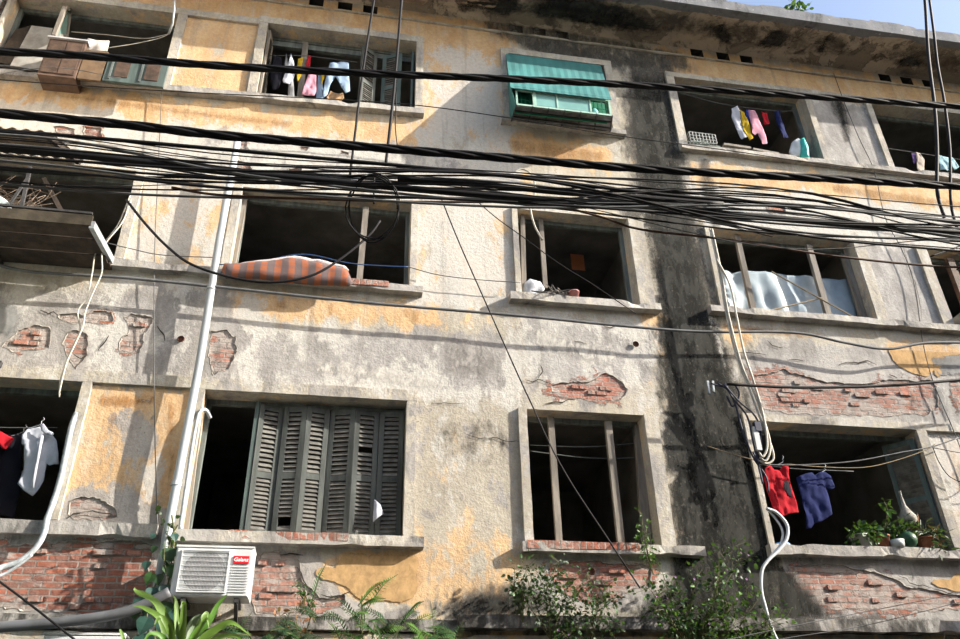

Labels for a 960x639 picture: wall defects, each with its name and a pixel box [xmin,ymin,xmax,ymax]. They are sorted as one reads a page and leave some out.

damp [831,101,850,141]
flaking render [0,304,153,369]
flaking render [207,329,238,376]
damp [446,0,824,620]
flaking render [539,367,628,408]
flaking render [746,349,960,420]
flaking render [67,496,118,521]
flaking render [0,537,156,615]
flaking render [787,558,960,620]